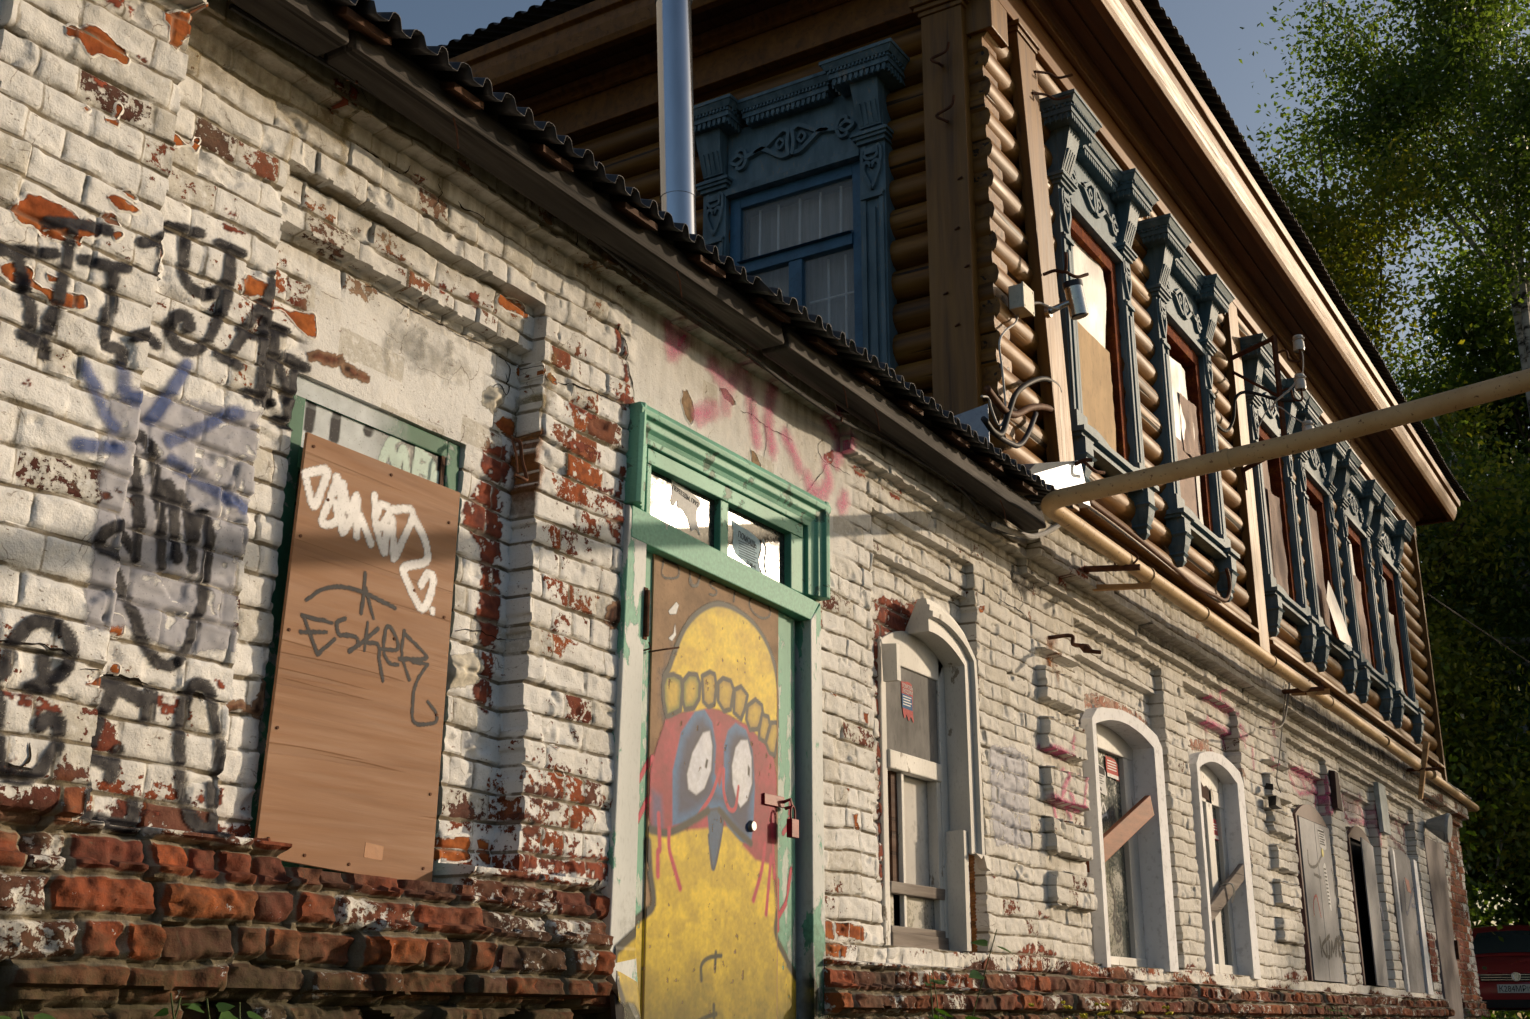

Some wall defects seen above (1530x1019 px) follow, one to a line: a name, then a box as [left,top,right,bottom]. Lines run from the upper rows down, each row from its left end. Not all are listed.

peeling [64,22,148,68]
peeling [7,187,142,249]
peeling [0,260,90,312]
peeling [241,273,370,384]
peeling [615,323,635,411]
peeling [595,466,626,552]
peeling [463,414,516,714]
spalling [604,599,621,630]
peeling [852,595,917,888]
peeling [433,834,492,867]
peeling [497,744,609,892]
peeling [1017,943,1057,958]